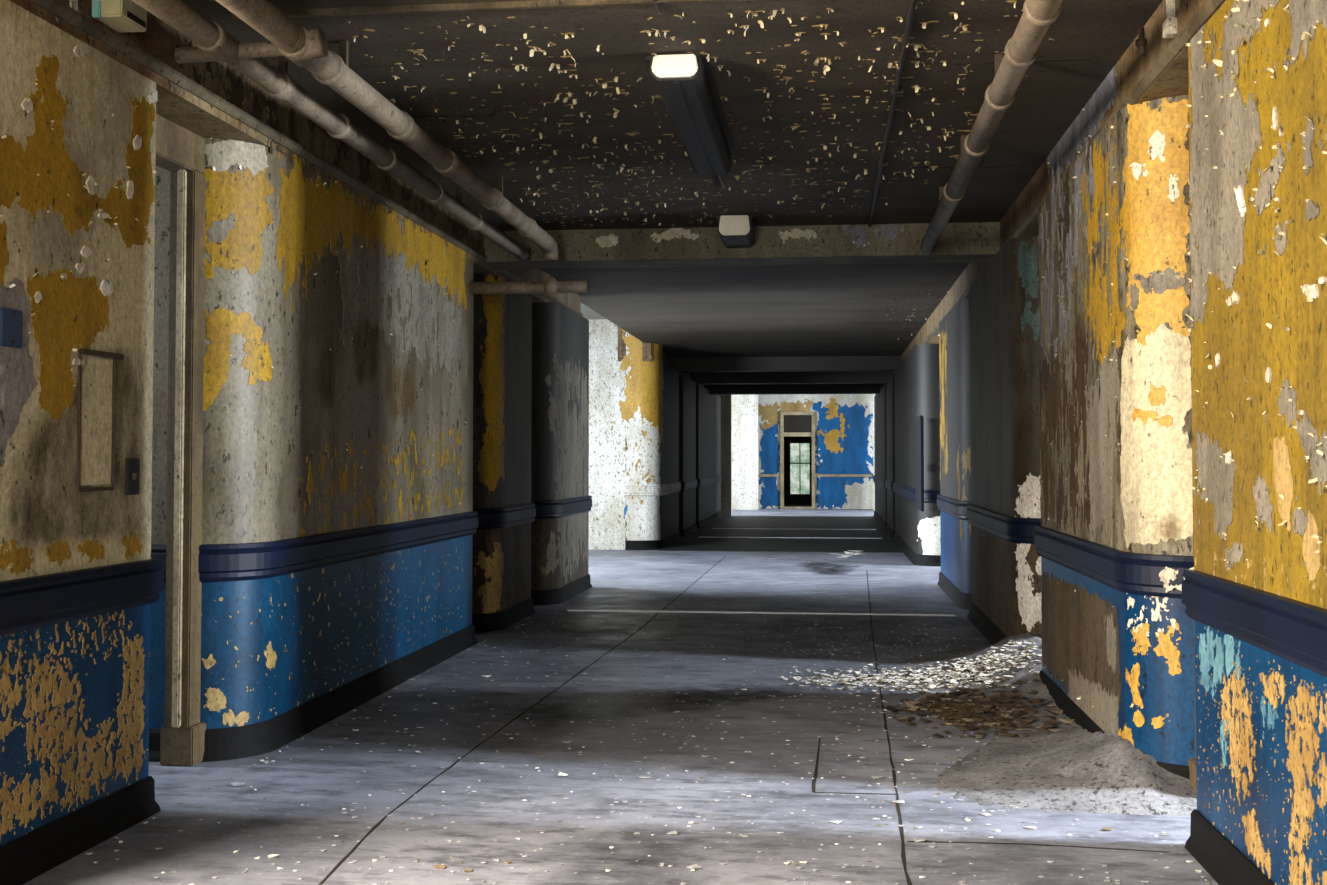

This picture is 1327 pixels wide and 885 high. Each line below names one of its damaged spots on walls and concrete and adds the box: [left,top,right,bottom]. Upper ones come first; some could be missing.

spalling [376,0,1004,248]
peeling [0,55,158,467]
peeling [180,62,506,536]
flaking render [541,353,589,584]
peeling [616,329,664,541]
peeling [759,398,873,509]
flaking render [1013,0,1327,885]